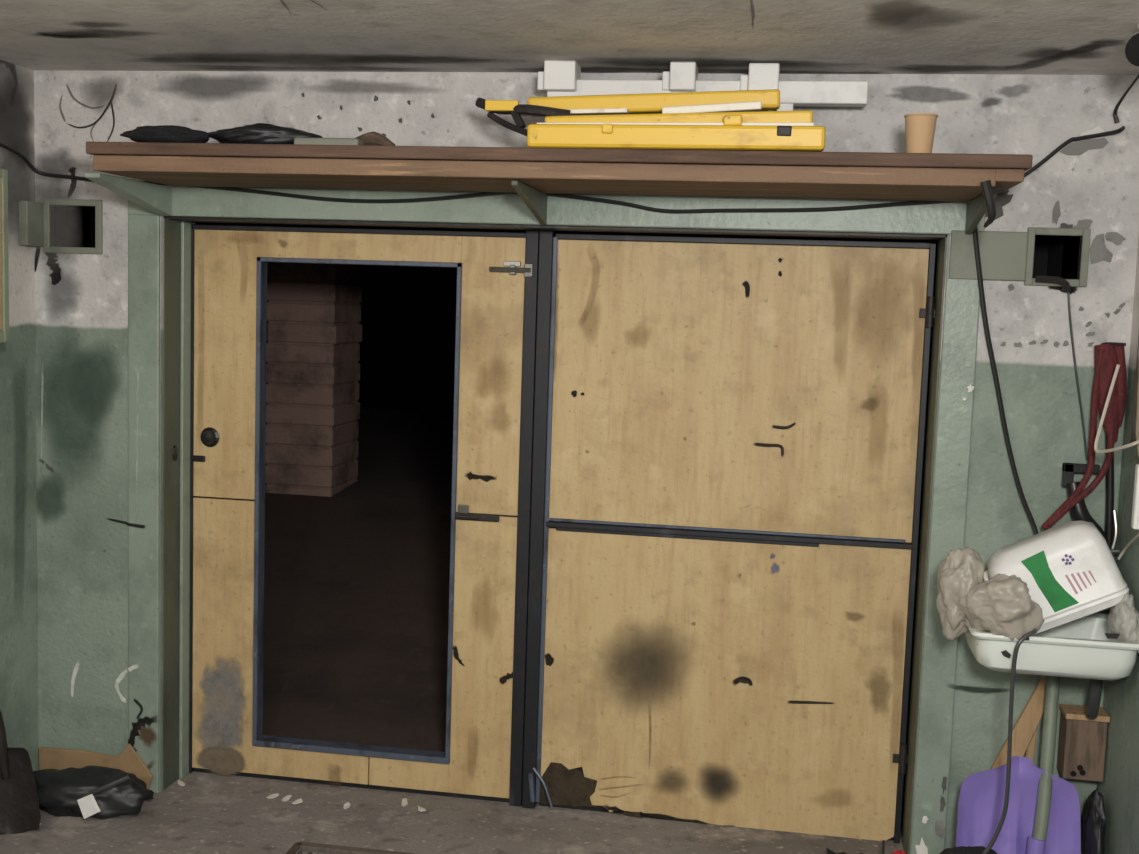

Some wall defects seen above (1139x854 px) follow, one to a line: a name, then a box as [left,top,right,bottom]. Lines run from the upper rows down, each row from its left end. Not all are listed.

water stain [0,60,77,272]
water stain [52,275,73,309]
water stain [41,356,113,465]
water stain [36,481,61,516]